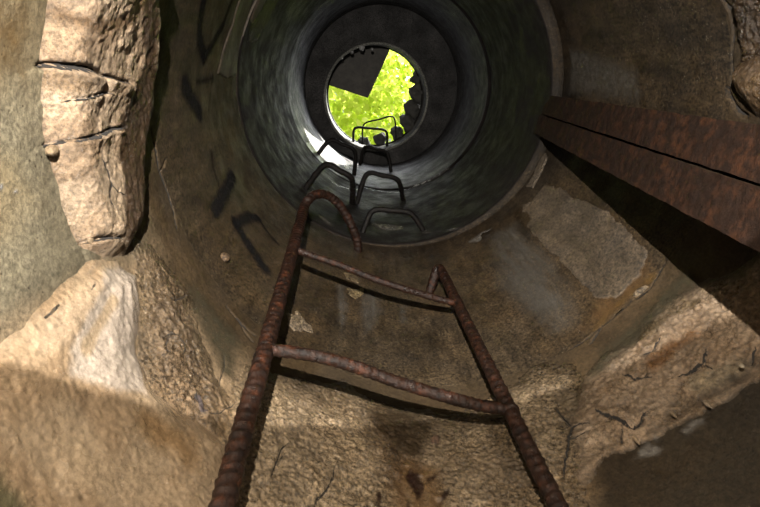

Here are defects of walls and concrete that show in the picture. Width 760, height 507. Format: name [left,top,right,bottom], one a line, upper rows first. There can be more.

peeling [522,153,648,299]
crack [622,373,652,381]
crack [678,349,713,377]
water stain [236,371,547,507]
crack [554,405,648,480]
rust [399,466,449,507]